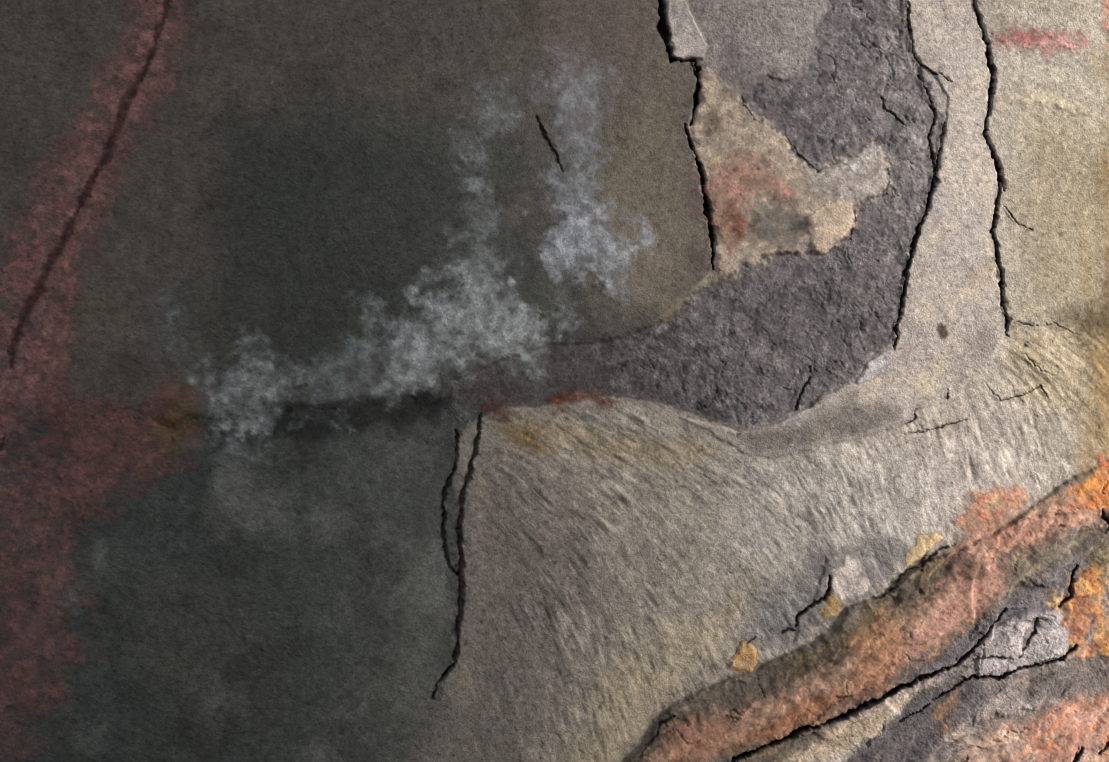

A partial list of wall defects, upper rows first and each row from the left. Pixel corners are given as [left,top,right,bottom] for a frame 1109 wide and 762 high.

crack [10,1,168,368]
crack [536,117,563,172]
damp [539,165,653,292]
spalling [549,0,946,428]
crack [973,1,1079,401]
damp [188,340,372,454]
damp [359,261,547,405]
crack [908,390,967,433]
crack [433,416,480,698]
corrosion [628,456,1109,762]
crack [731,564,1079,762]
crack [874,546,949,599]